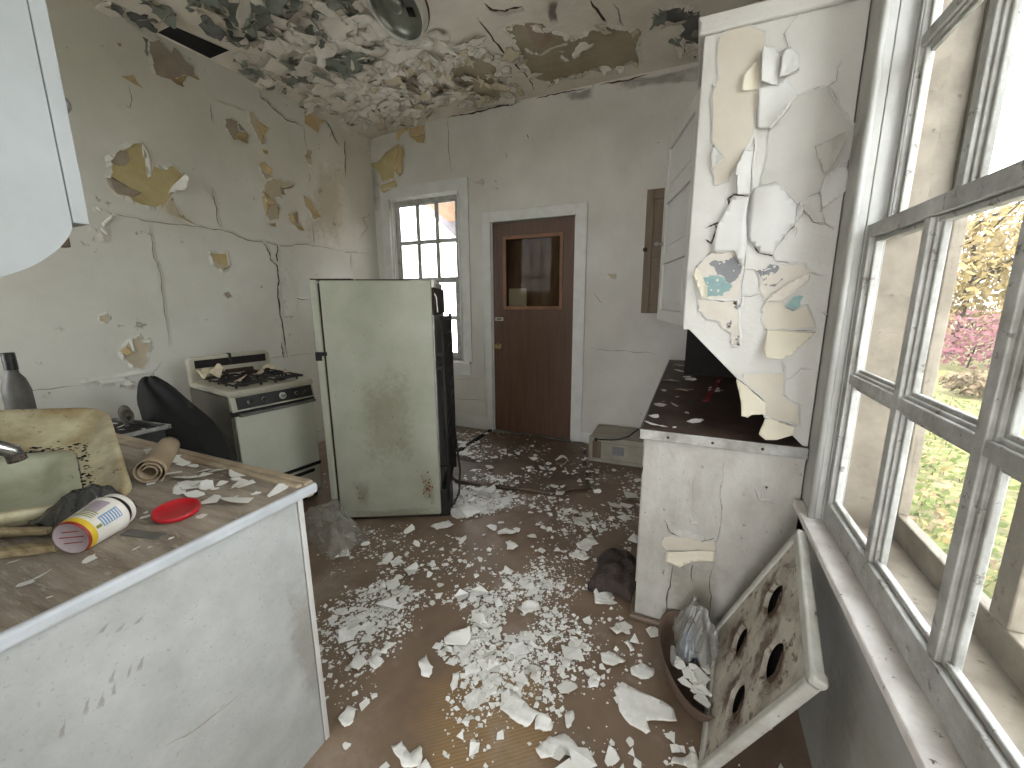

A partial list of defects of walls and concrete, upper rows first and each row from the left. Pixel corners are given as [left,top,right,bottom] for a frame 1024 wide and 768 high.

crack [585,0,623,26]
peeling [95,0,705,193]
crack [447,4,649,173]
peeling [102,139,194,224]
peeling [208,250,232,273]
crack [88,186,378,371]
peeling [222,109,321,234]
peeling [693,25,855,440]
peeling [78,333,155,391]
peeling [660,534,716,568]
crack [664,453,725,621]